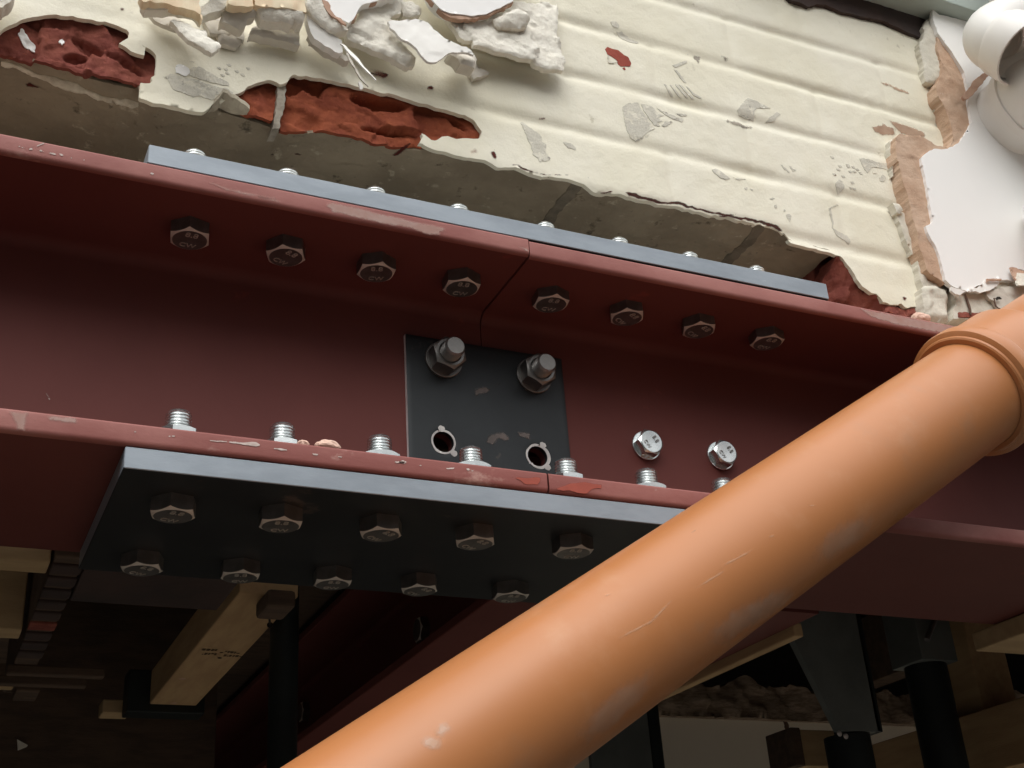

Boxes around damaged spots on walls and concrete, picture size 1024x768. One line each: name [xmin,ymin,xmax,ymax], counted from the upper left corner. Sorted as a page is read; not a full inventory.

peeling [605,21,638,70]
spalling [0,0,566,150]
peeling [521,122,550,162]
peeling [622,102,687,142]
peeling [737,98,780,123]
spalling [805,18,1024,326]